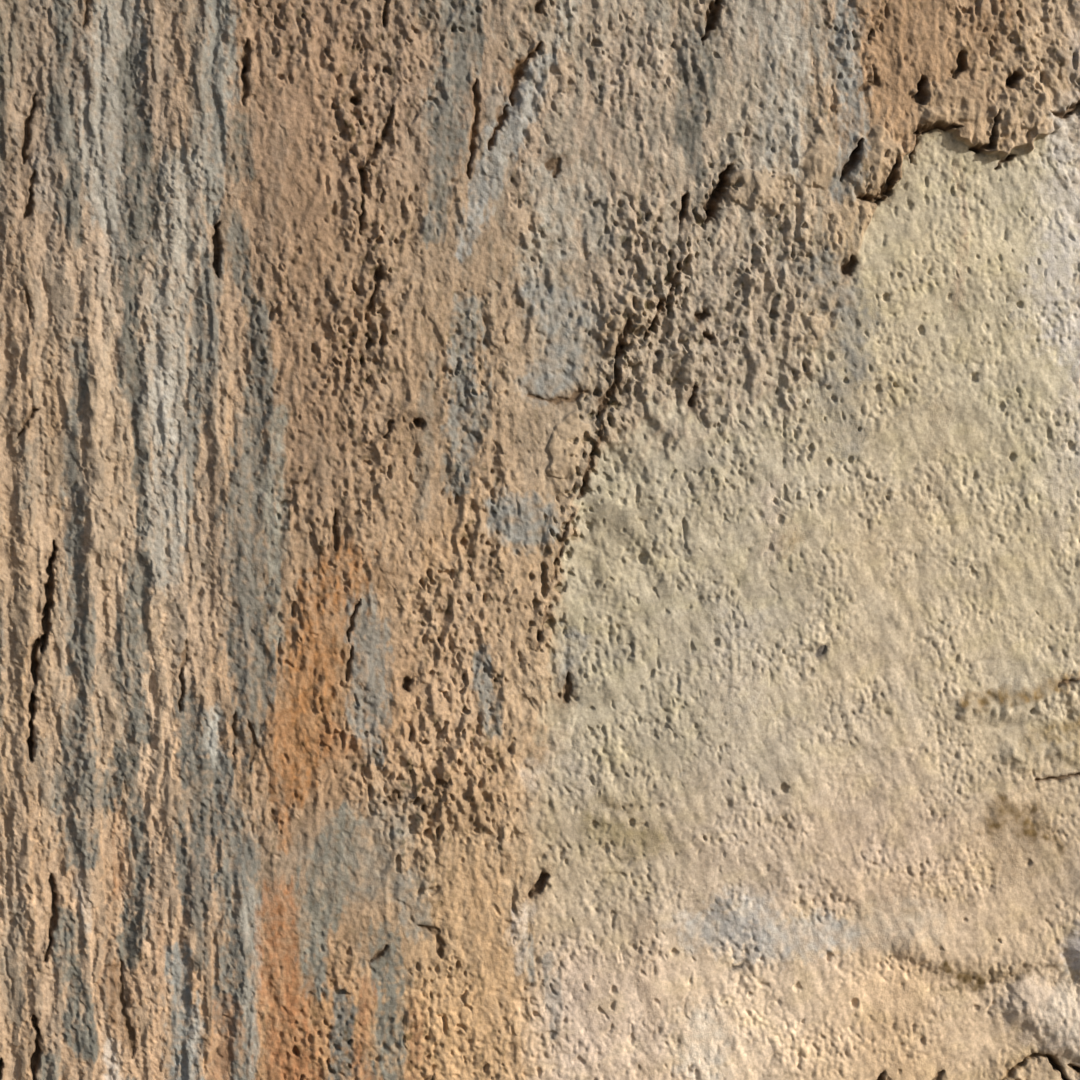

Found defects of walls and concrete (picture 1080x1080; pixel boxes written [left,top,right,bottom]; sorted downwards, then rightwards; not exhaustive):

spalling [1066,0,1080,32]
crack [16,94,41,222]
crack [464,39,548,180]
crack [676,158,745,231]
crack [532,259,687,652]
spalling [514,44,1080,1080]
crack [21,538,65,765]
rust [262,502,476,857]
crack [40,872,63,964]
rust [200,868,327,1080]
crack [0,1012,48,1080]
crack [1000,1050,1080,1080]